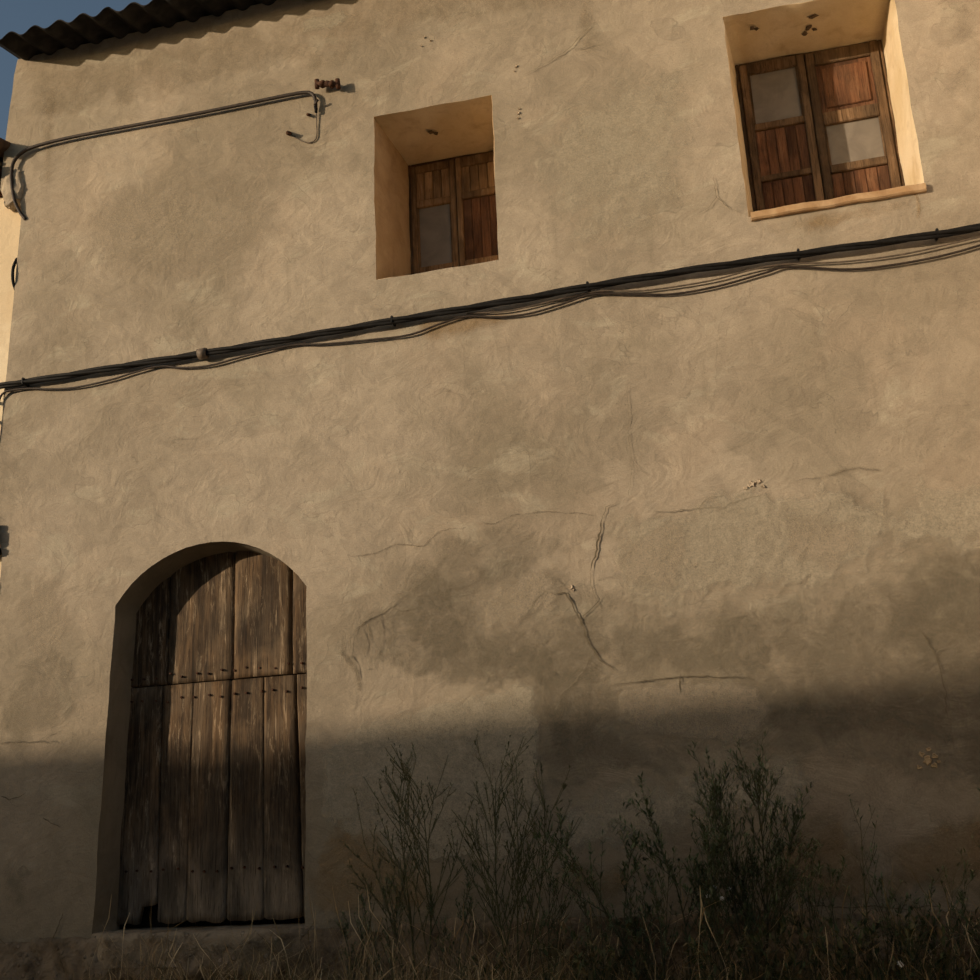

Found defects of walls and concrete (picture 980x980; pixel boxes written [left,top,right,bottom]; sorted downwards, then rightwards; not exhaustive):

crack [519,504,791,694]
water stain [615,488,980,614]